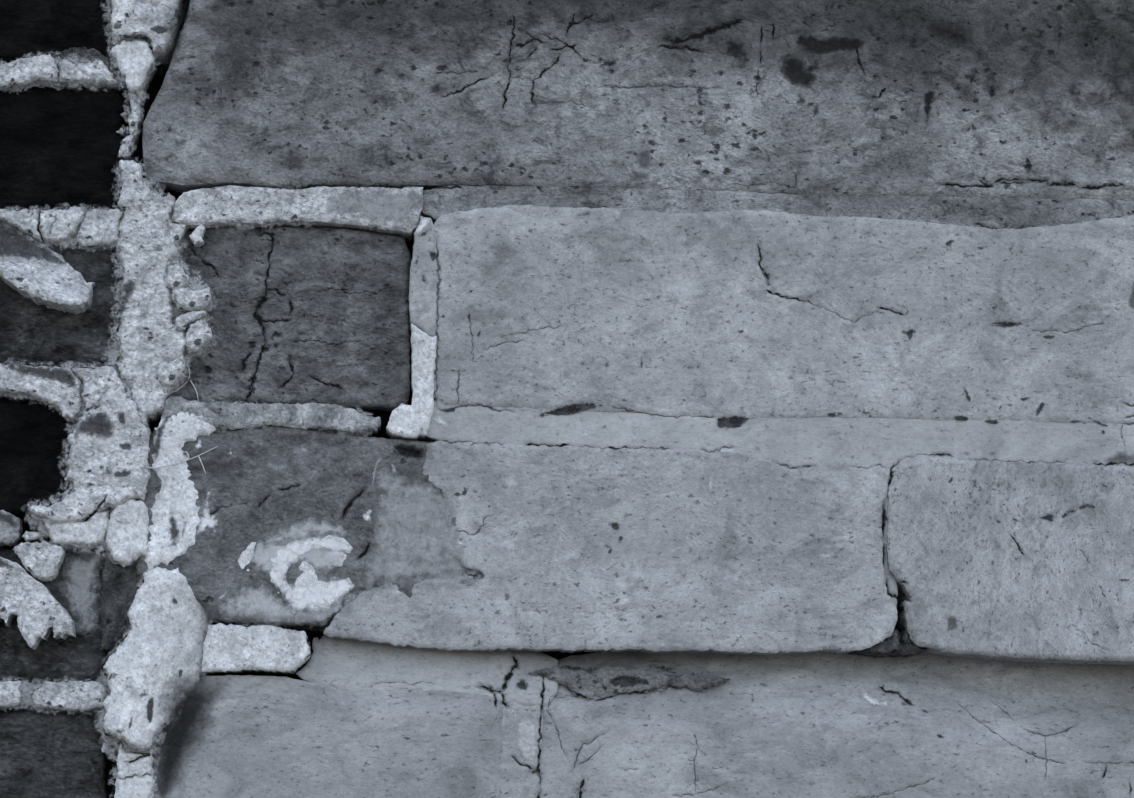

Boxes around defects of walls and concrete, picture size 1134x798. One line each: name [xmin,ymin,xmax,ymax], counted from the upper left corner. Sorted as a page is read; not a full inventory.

crack [437,14,715,108]
peeling [0,221,96,314]
crack [242,232,362,402]
crack [758,246,908,322]
spalling [395,446,423,458]
crack [1094,403,1134,466]
peeling [359,468,483,593]
peeling [221,598,350,623]
crack [886,581,910,645]
spalling [611,675,649,687]